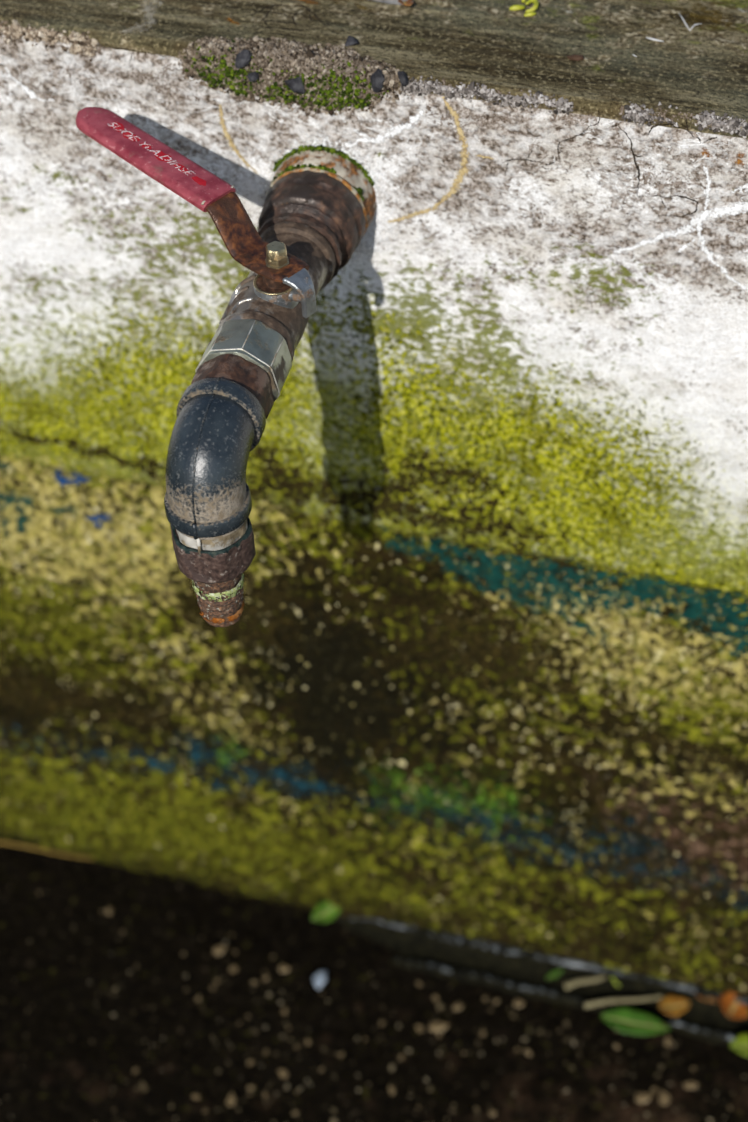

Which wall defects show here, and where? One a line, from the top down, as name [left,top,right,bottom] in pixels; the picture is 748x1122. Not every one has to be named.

water stain [5,67,54,101]
water stain [260,110,424,259]
water stain [613,166,748,290]
corrosion [198,600,244,624]
water stain [162,438,748,875]